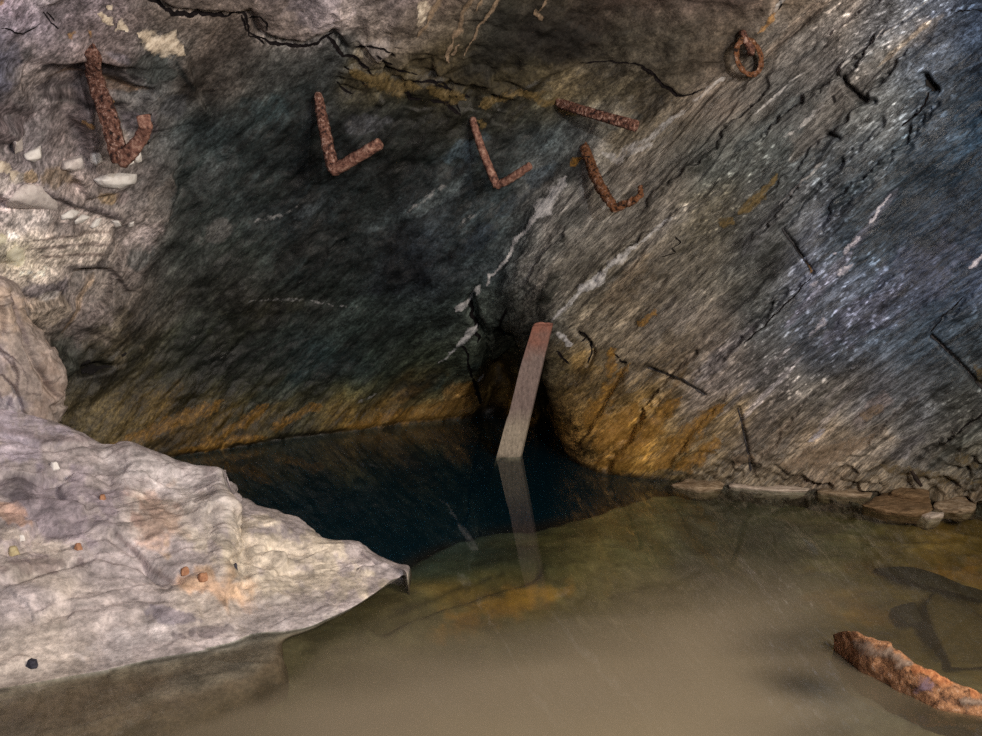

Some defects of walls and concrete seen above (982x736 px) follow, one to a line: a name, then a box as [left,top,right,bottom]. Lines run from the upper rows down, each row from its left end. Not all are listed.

crack [3,12,59,35]
crack [149,0,470,115]